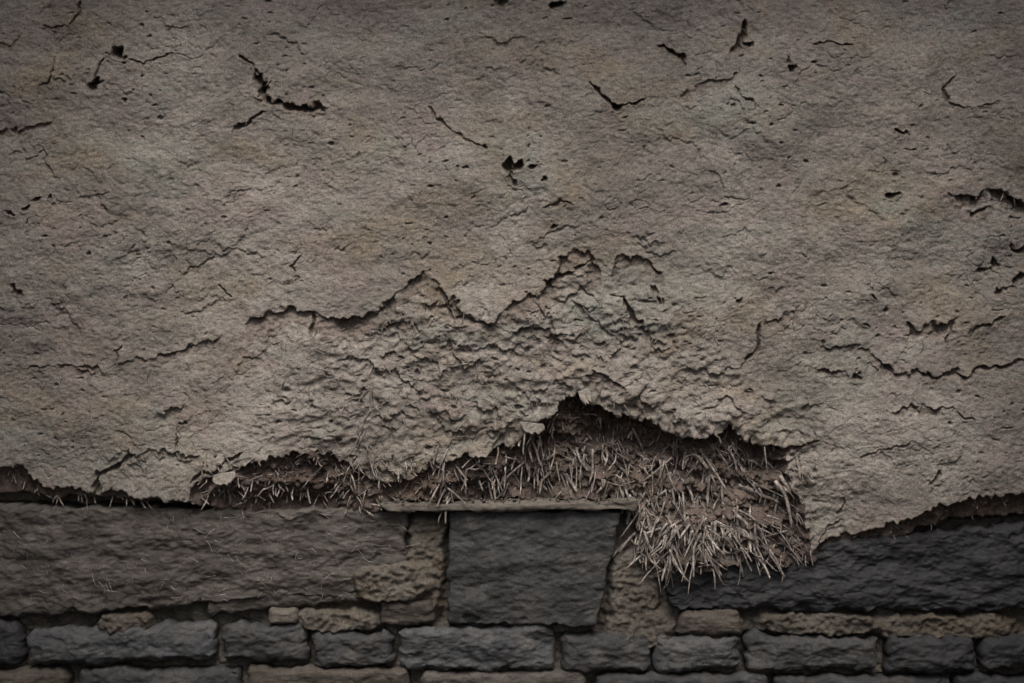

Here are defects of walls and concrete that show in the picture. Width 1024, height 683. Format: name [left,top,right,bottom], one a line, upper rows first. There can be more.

crack [129,52,175,66]
crack [232,55,328,132]
crack [589,81,646,112]
crack [656,20,756,106]
crack [815,343,1024,422]
flaking render [0,367,1024,594]